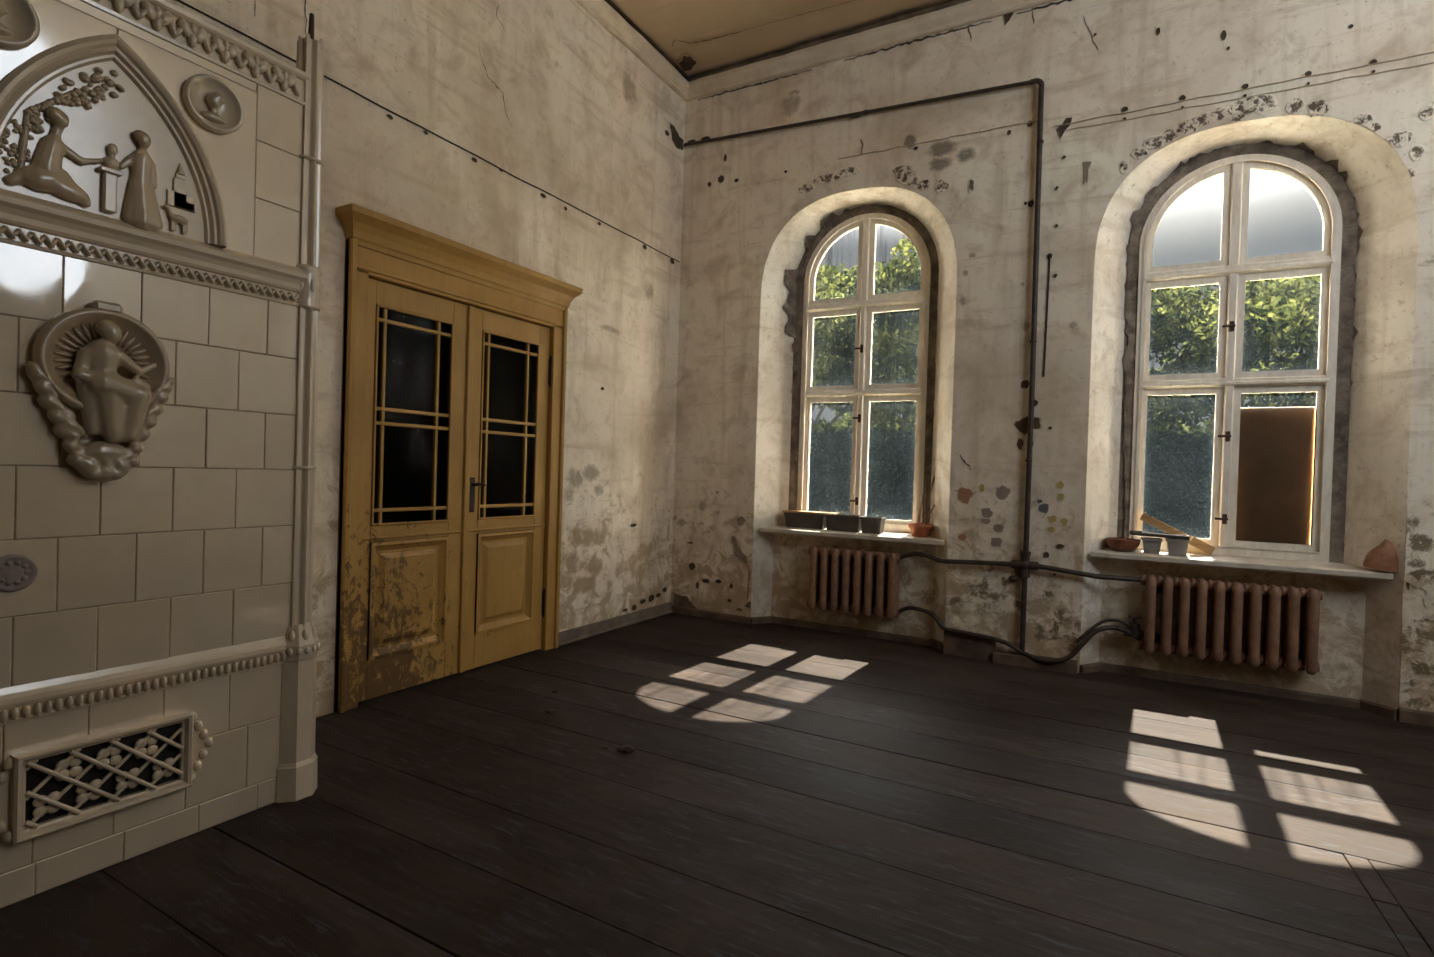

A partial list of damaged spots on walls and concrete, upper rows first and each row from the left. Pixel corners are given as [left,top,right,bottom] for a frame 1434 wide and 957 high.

flaking render [561,521,751,618]
flaking render [946,544,1081,656]
flaking render [1399,502,1434,712]